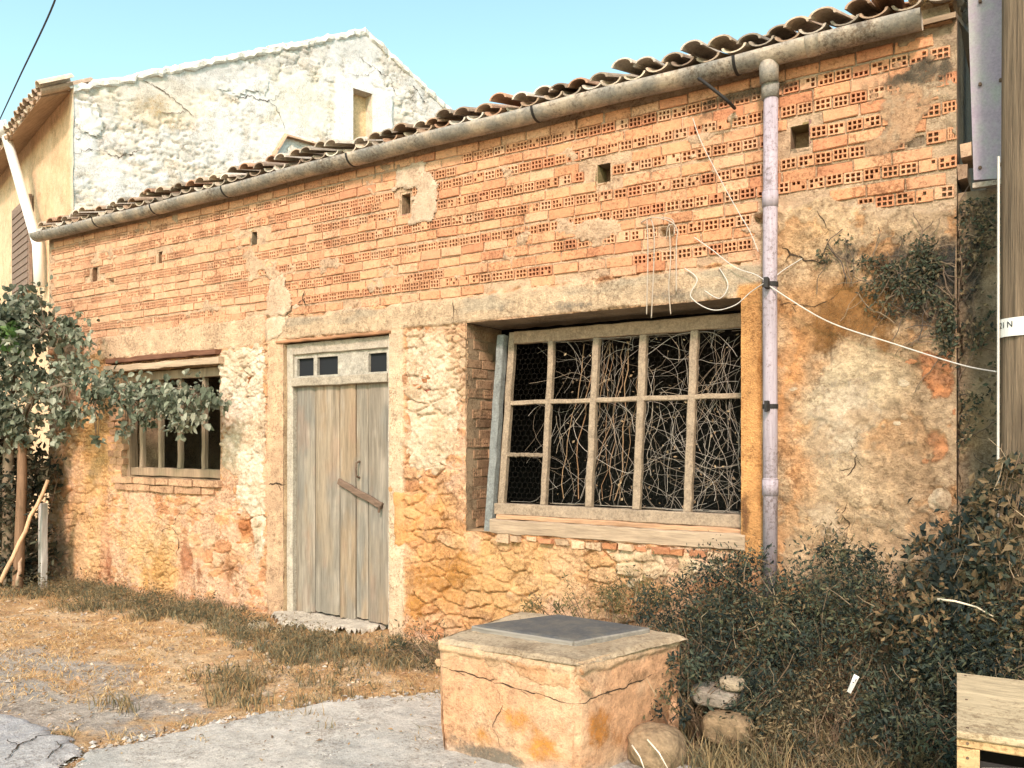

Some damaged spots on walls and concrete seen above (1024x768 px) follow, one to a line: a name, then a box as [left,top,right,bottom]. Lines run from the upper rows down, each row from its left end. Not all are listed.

crack [143,80,194,117]
flaking render [391,161,439,226]
crack [781,245,825,264]
spalling [905,351,955,415]
crack [444,667,666,747]
crack [5,732,74,760]